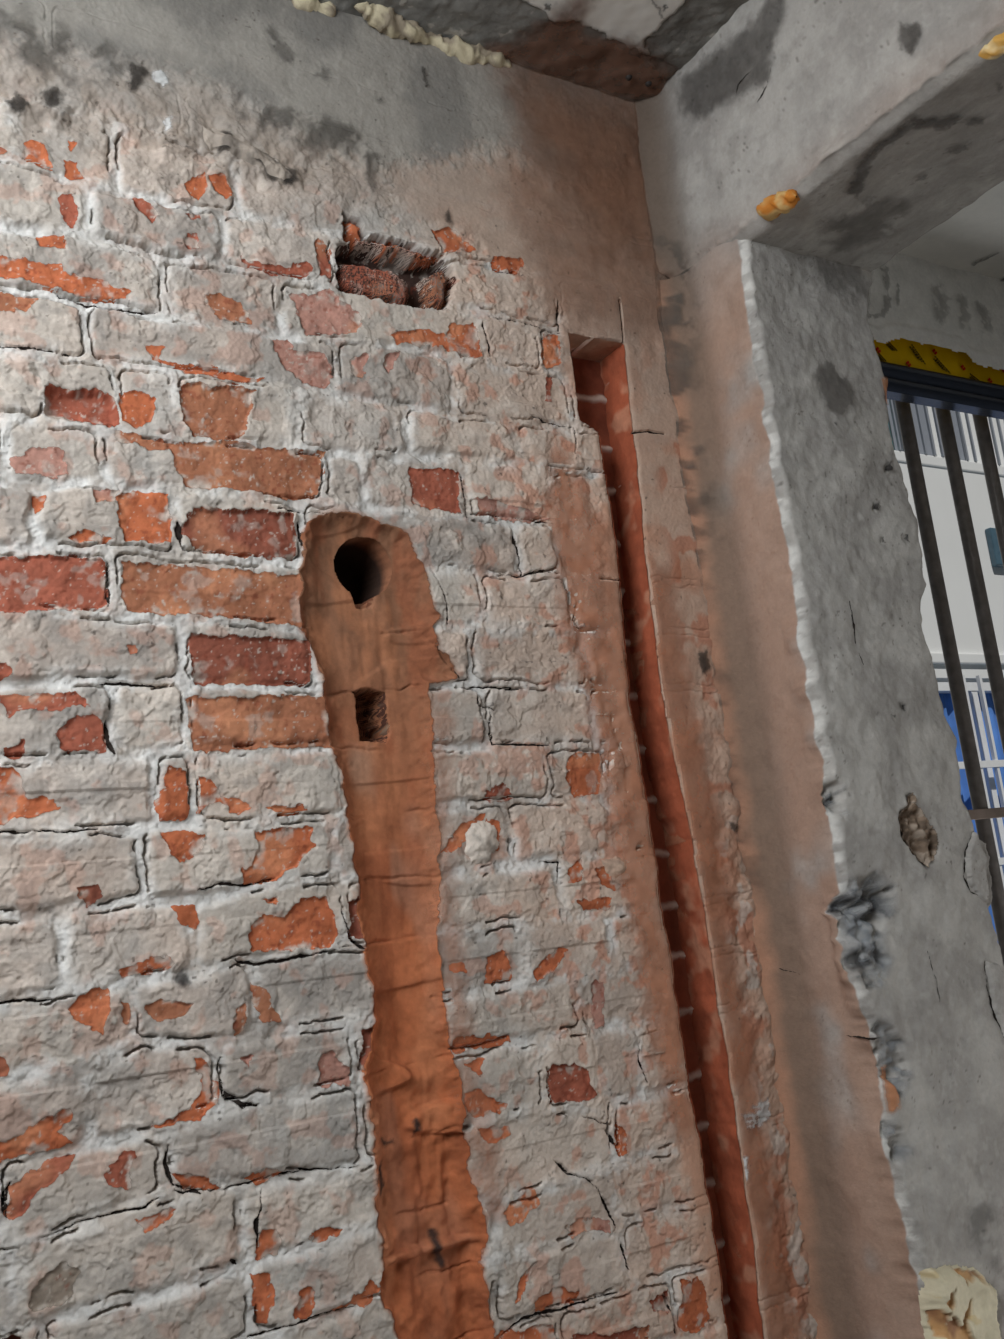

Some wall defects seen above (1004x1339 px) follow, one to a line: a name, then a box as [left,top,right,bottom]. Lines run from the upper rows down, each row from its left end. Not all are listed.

damp [14,24,67,64]
damp [153,70,168,86]
damp [260,107,292,127]
damp [306,119,360,148]
damp [847,116,983,196]
spalling [0,140,131,312]
spalling [240,221,483,389]
flaking render [408,467,549,524]
flaking render [0,345,331,755]
spalling [153,766,364,952]
spalling [68,987,194,1035]
crack [555,1162,629,1270]